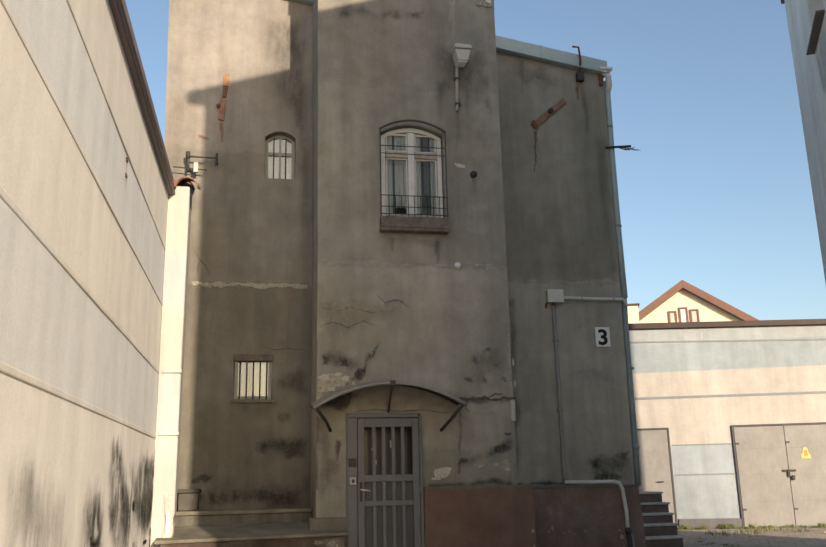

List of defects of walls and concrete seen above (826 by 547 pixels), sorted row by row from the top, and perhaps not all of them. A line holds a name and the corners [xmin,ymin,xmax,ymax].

spalling [317,372,355,398]
crack [357,393,516,413]
spalling [431,467,452,480]
leakage [110,446,154,547]
leakage [87,505,101,547]